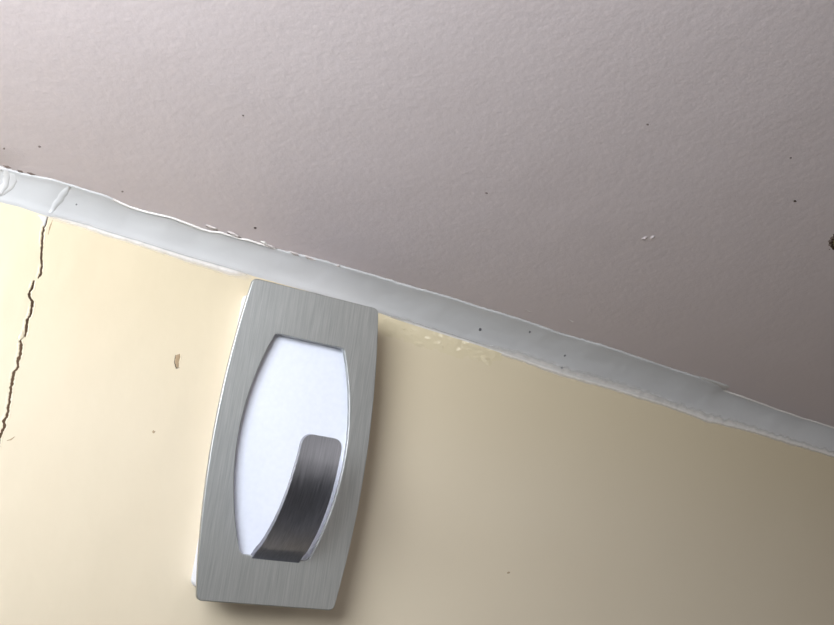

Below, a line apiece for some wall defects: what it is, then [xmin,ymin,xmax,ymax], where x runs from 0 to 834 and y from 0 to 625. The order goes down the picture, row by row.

crack [0,215,53,449]